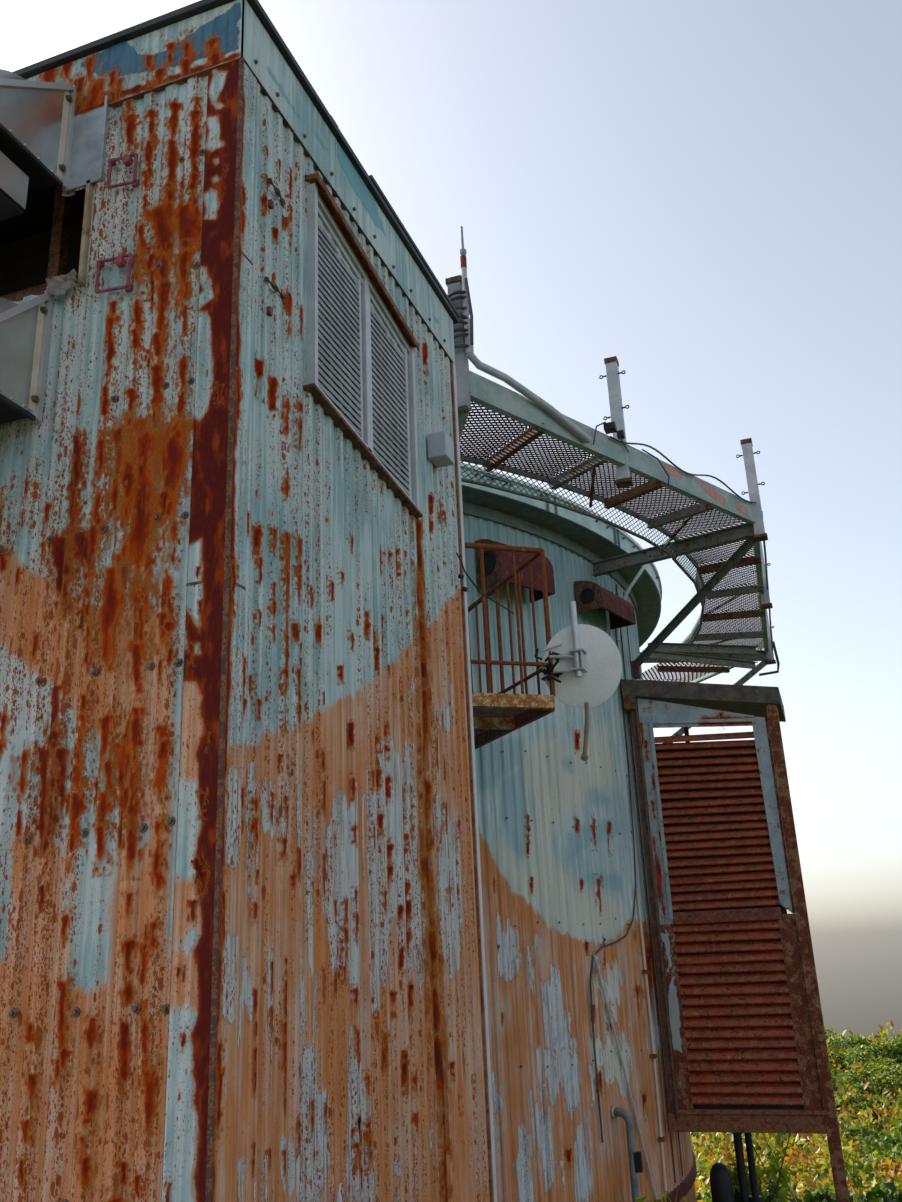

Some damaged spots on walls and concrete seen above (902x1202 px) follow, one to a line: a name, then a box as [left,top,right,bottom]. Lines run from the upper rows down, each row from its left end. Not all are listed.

corrosion [0,28,475,1202]
peeling [434,683,455,751]
corrosion [574,816,612,854]
corrosion [580,876,603,912]
peeling [221,732,463,1202]
corrosion [633,926,656,1015]
peeling [491,911,662,1202]